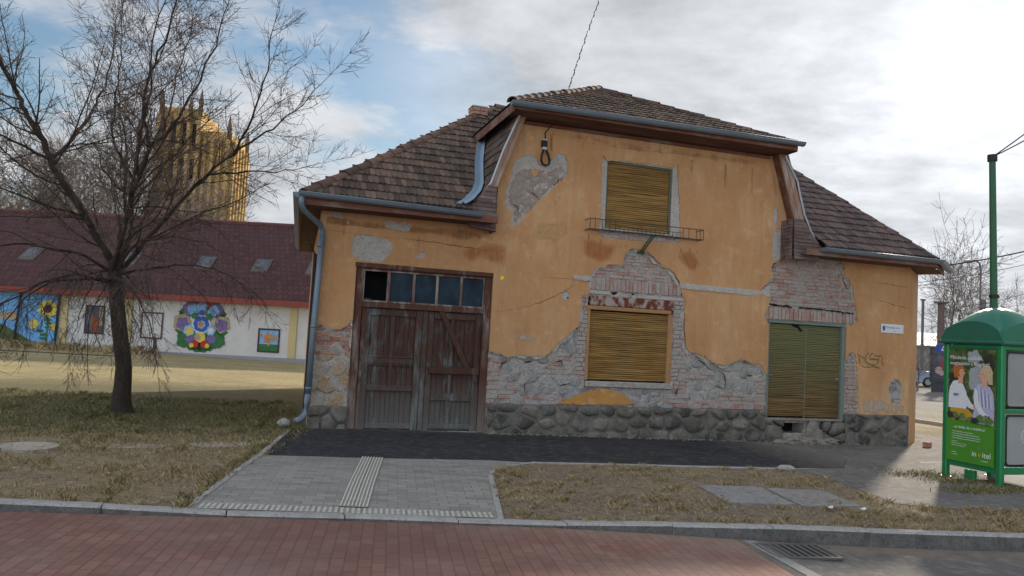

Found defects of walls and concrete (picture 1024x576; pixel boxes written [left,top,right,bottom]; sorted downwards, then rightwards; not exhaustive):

peeling [330,211,413,263]
spalling [485,153,766,418]
spalling [763,208,858,332]
spalling [309,320,353,407]
spalling [888,379,902,405]